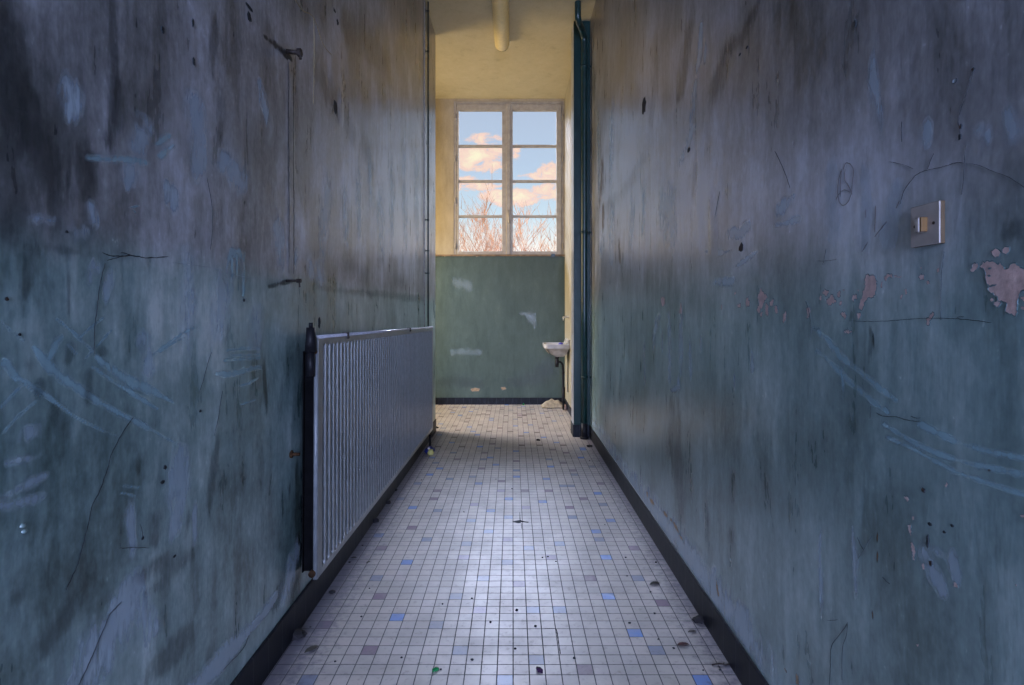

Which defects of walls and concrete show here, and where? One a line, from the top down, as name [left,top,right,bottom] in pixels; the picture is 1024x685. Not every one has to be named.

peeling [970,246,1024,317]